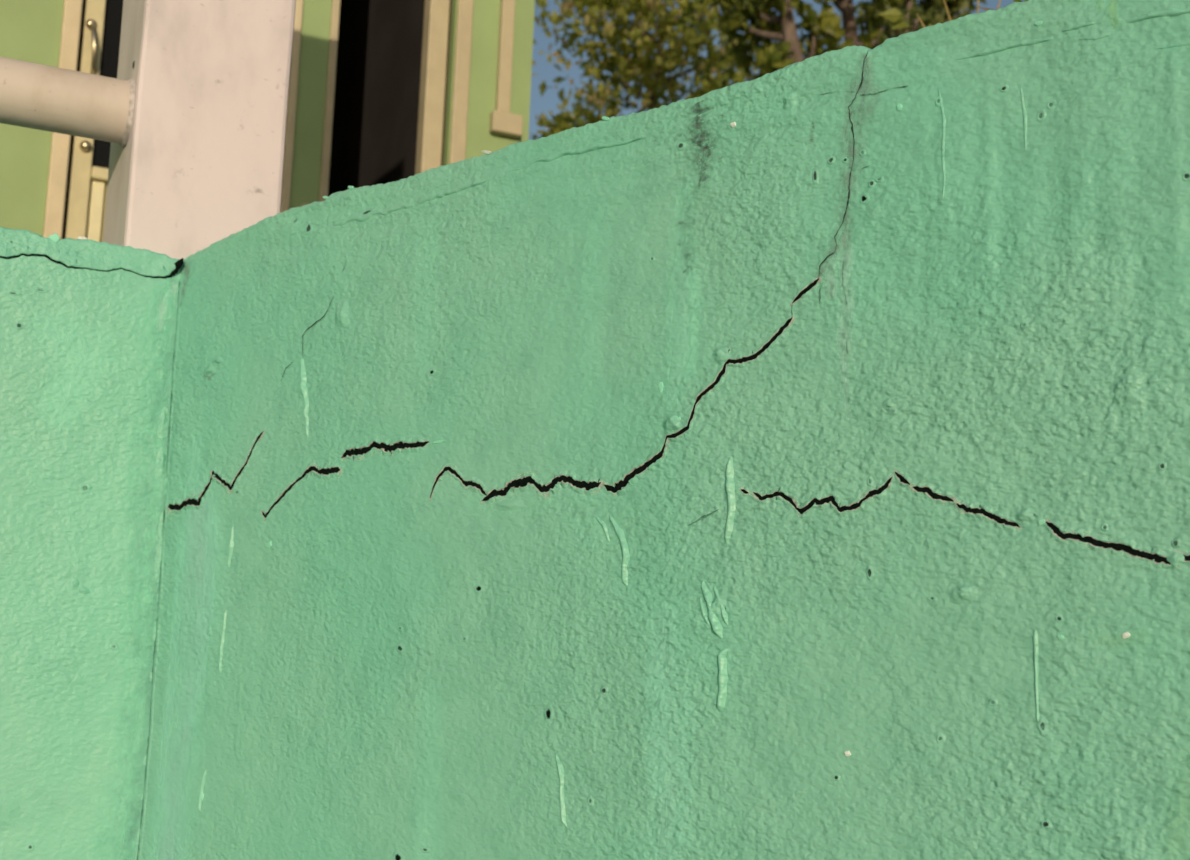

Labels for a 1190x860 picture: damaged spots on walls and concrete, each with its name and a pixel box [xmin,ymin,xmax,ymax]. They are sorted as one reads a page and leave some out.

crack [261,52,908,521]
crack [689,470,1190,569]